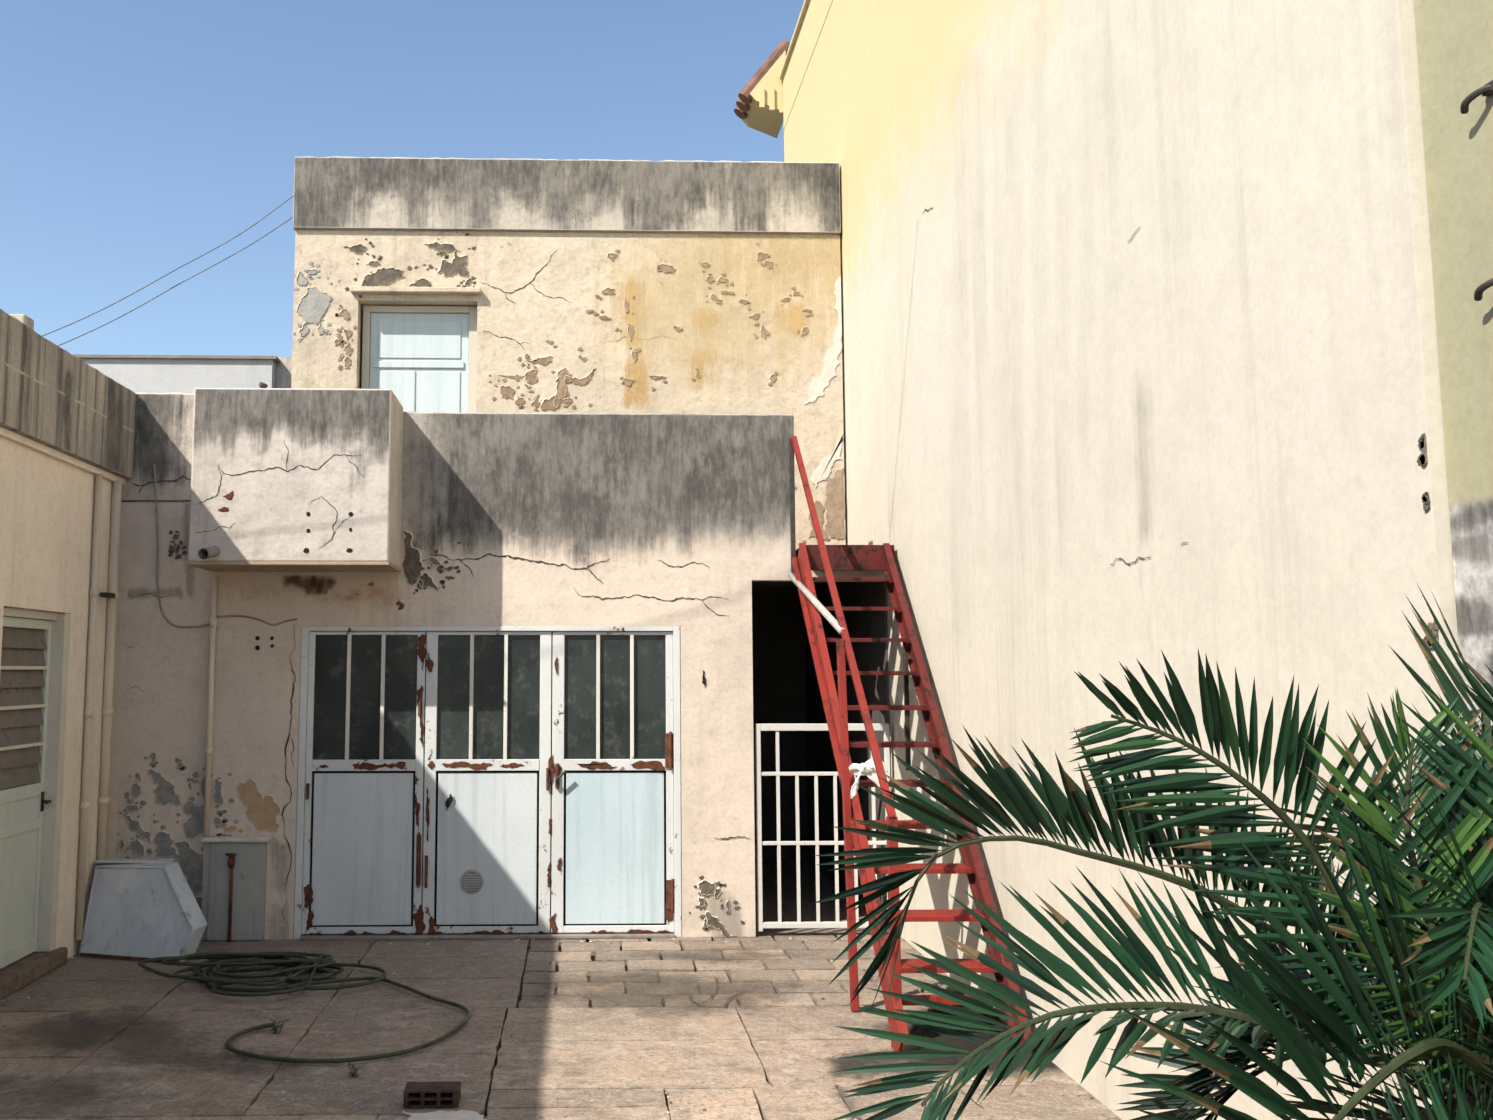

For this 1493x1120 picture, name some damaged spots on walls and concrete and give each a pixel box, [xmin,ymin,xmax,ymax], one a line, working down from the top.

leakage [293,157,840,232]
peeling [293,232,476,370]
crack [481,250,574,350]
peeling [489,340,596,413]
leakage [0,373,390,485]
crack [133,443,365,548]
leakage [415,414,795,560]
crack [421,553,731,616]
corrosion [443,761,524,770]
corrosion [578,761,665,771]
corrosion [589,905,674,933]
flaking render [689,876,744,937]